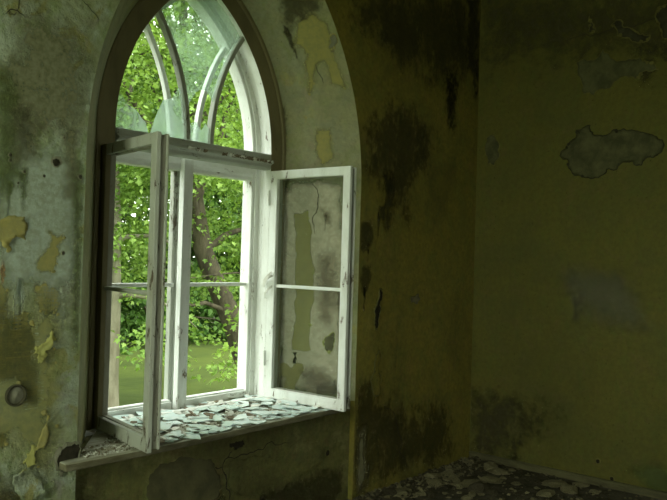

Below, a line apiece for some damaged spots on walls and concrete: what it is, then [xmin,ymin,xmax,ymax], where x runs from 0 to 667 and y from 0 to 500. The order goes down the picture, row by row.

peeling [296,15,346,96]
leakage [359,0,480,129]
leakage [361,109,429,254]
flaking render [0,129,83,468]
leakage [354,381,450,494]